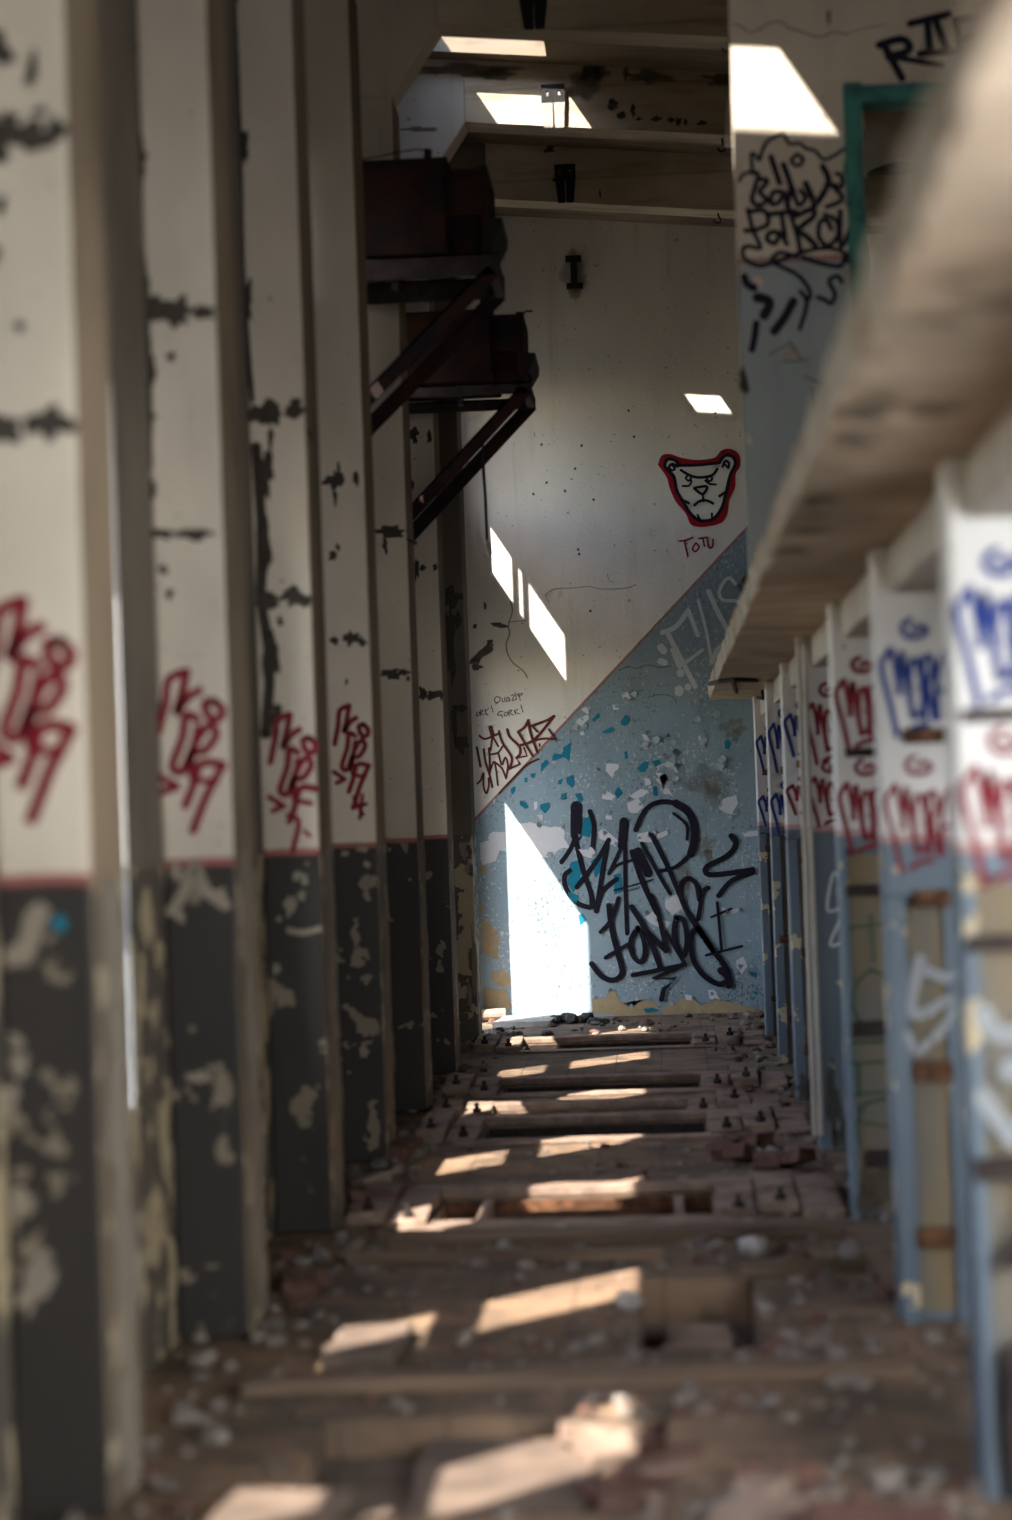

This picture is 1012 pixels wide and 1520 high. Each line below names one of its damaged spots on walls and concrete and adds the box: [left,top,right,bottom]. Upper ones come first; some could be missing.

spalling [0,28,68,164]
spalling [144,274,217,386]
spalling [0,402,81,444]
spalling [152,529,217,542]
spalling [248,398,315,573]
spalling [254,585,312,734]
peeling [3,899,52,968]
peeling [2,1033,30,1121]
peeling [166,847,318,1310]
peeling [276,845,395,1227]
peeling [10,1186,33,1222]
peeling [14,1250,57,1319]